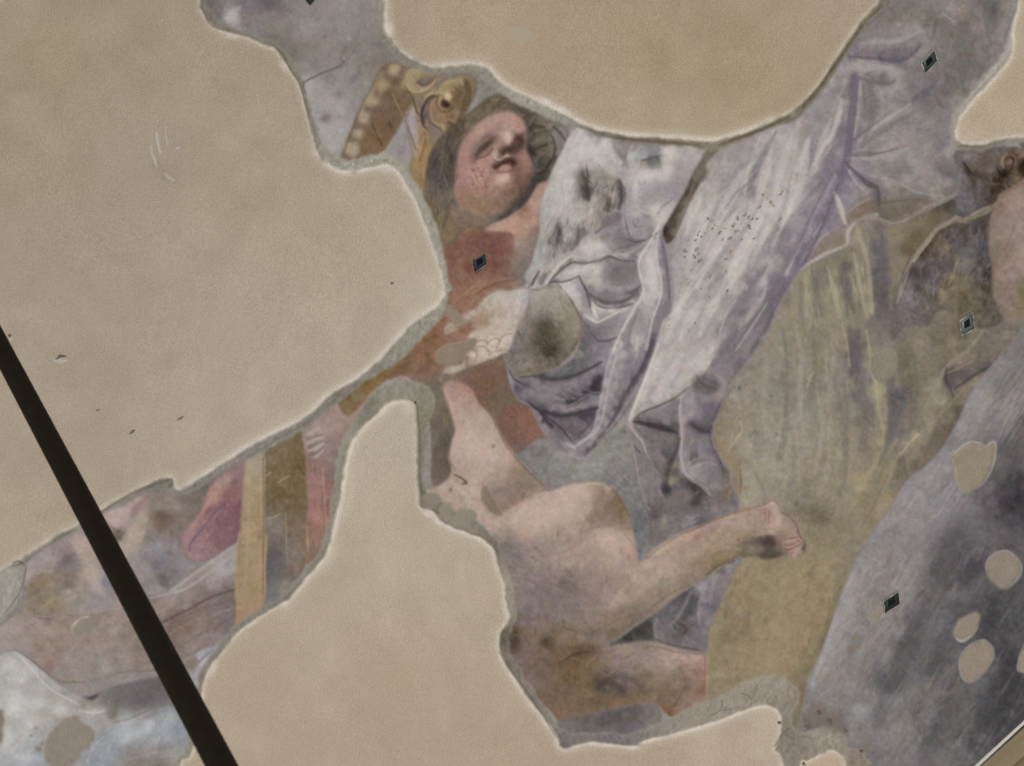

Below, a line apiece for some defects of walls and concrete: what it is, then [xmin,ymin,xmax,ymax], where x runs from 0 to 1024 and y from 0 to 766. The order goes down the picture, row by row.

flaking render [375,0,887,151]
flaking render [950,0,1024,151]
flaking render [0,0,451,514]
flaking render [0,371,82,624]
flaking render [197,378,871,766]
flaking render [173,737,204,766]